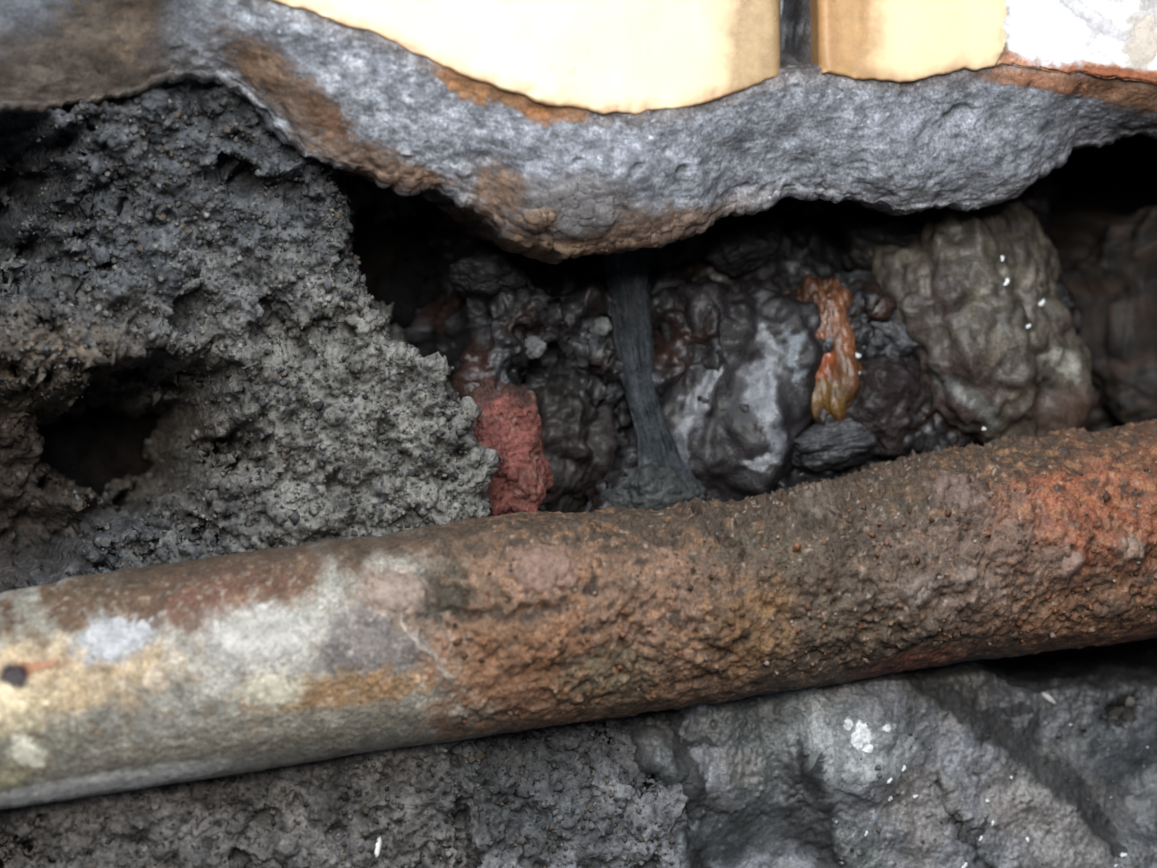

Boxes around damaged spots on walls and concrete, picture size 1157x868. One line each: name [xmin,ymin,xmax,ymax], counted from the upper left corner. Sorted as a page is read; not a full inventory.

rust [991,51,1157,113]
rust [221,28,715,263]
rust [811,279,863,422]
rust [792,482,842,520]
rust [922,469,989,516]
rust [505,544,581,594]
rust [901,565,981,611]
rust [1057,545,1084,580]
rust [1112,533,1146,563]
crack [906,675,1127,868]